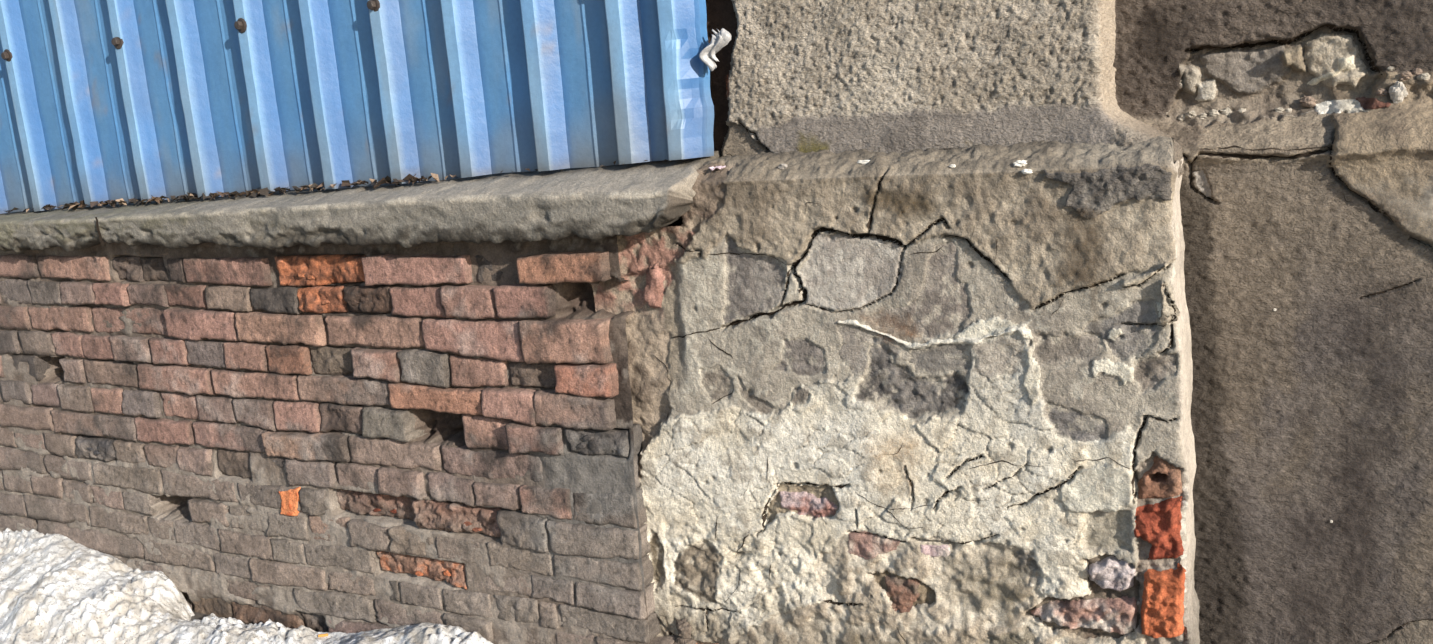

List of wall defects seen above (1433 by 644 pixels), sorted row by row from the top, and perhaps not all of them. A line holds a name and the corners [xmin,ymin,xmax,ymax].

spalling [1167,27,1430,128]
crack [1183,118,1432,247]
crack [656,172,1009,423]
crack [1035,266,1177,353]
crack [1360,280,1417,298]
spalling [767,483,840,524]
spalling [848,531,936,613]
crack [669,415,1176,635]
spalling [976,452,1190,644]